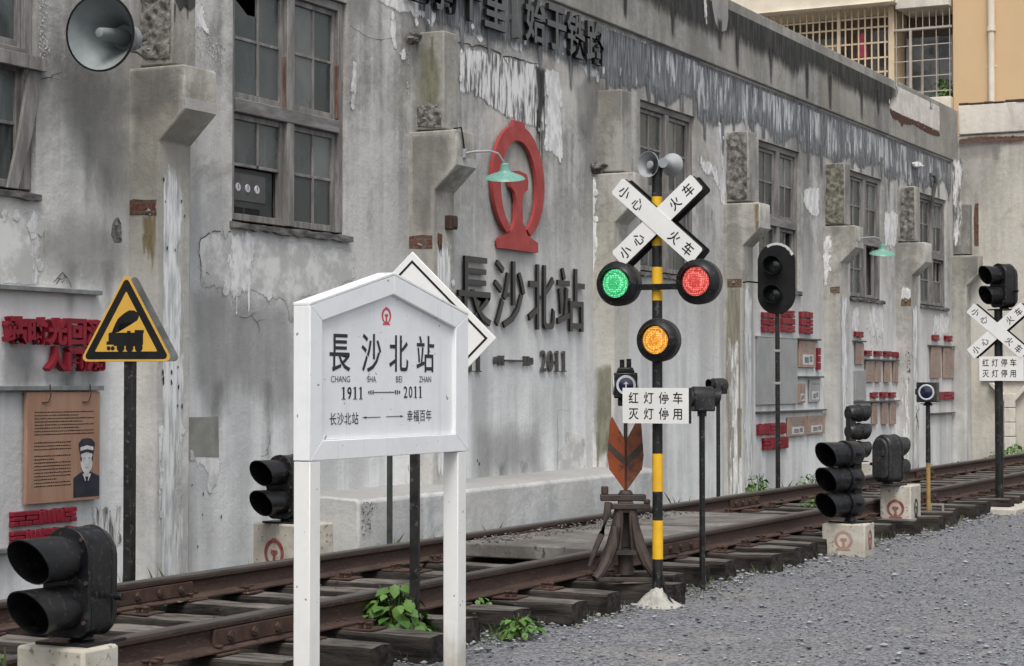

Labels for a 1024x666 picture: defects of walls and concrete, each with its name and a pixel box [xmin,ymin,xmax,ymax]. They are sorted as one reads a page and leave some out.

peeling [459,24,567,163]
water stain [418,0,951,199]
spalling [579,16,979,249]
flaking render [0,209,45,285]
corrosion [143,217,155,259]
flaking render [198,225,356,322]
peeling [111,168,220,576]